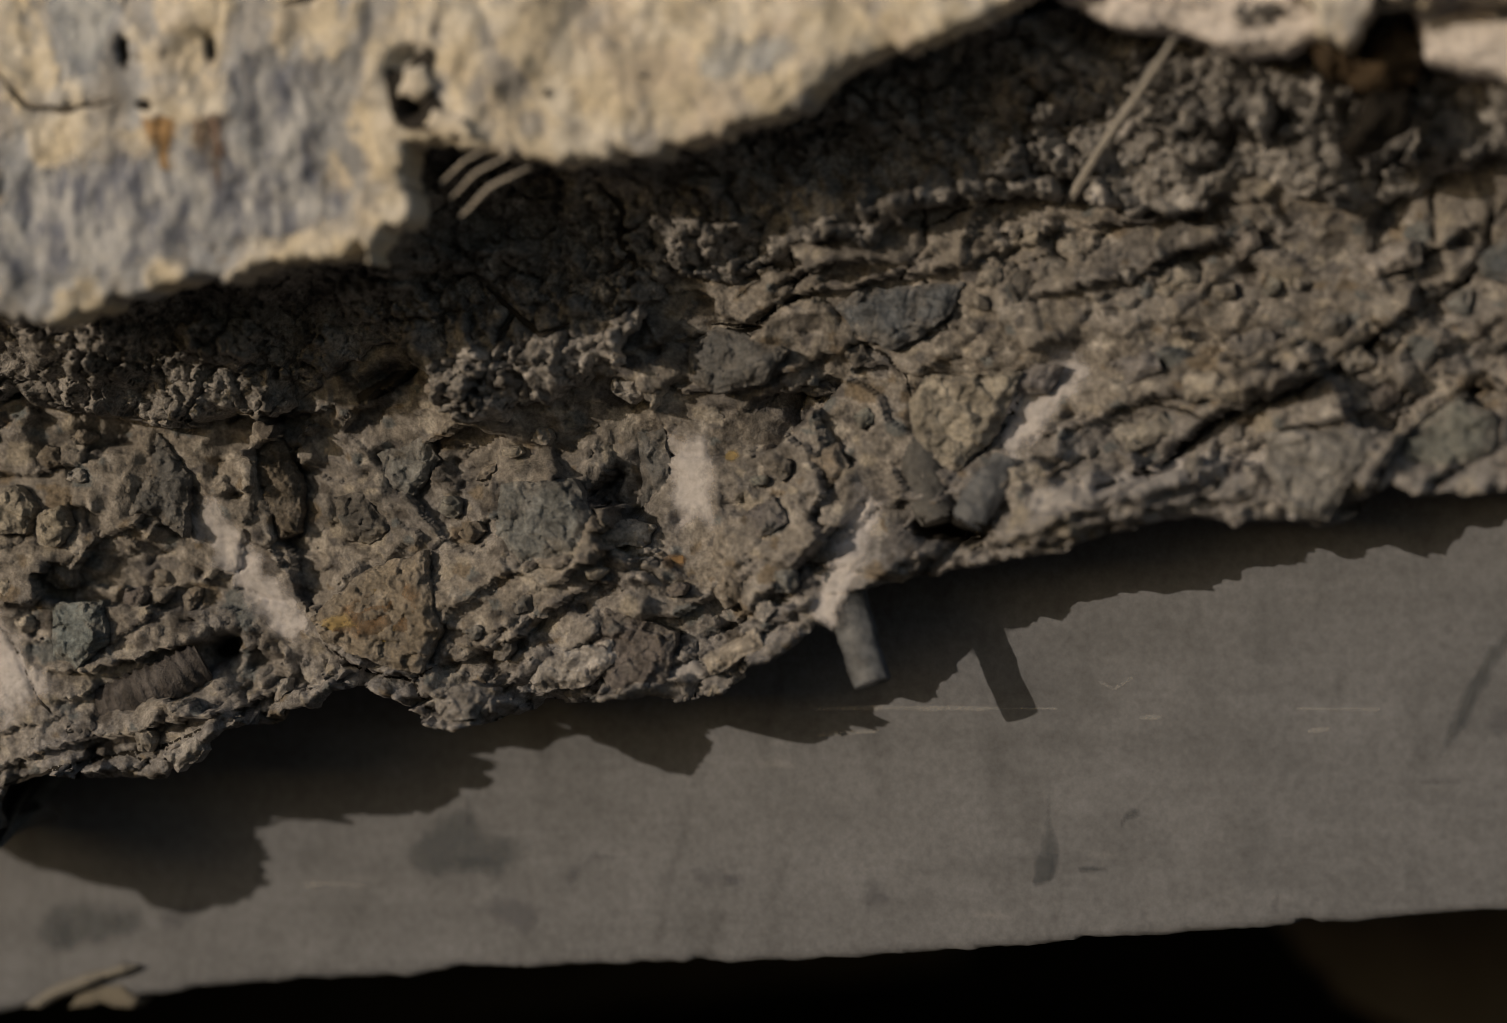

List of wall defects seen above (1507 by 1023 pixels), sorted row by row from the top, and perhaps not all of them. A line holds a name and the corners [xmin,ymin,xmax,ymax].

spalling [1014,0,1065,15]
spalling [384,45,478,139]
spalling [0,155,1507,847]